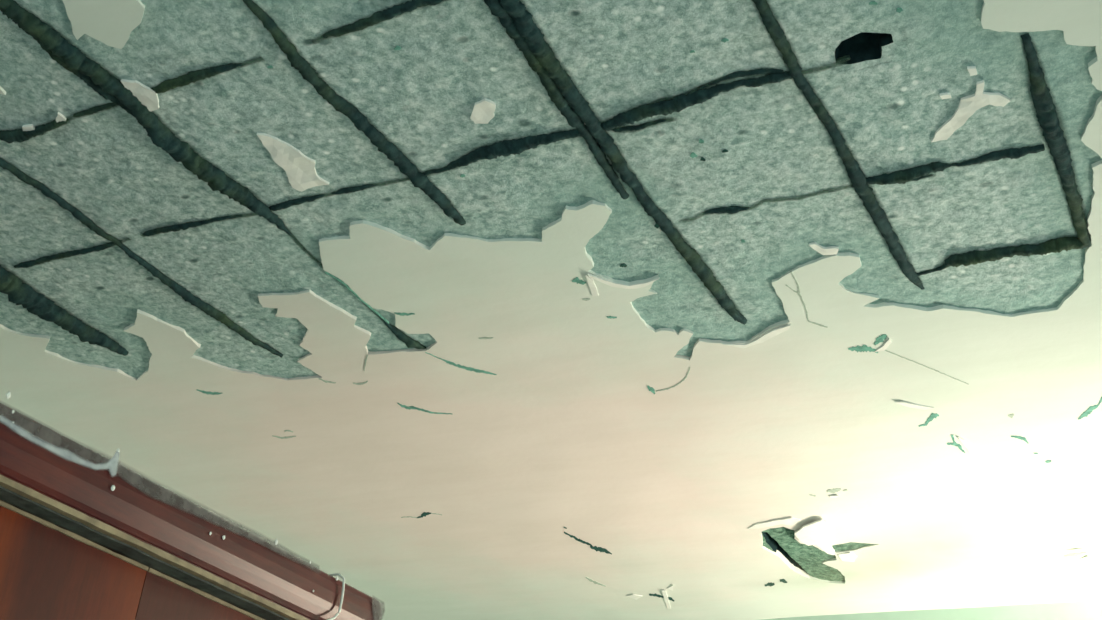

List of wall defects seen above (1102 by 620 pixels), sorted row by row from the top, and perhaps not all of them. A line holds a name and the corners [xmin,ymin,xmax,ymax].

spalling [0,0,1102,379]
crack [564,527,612,555]
spalling [747,517,873,581]